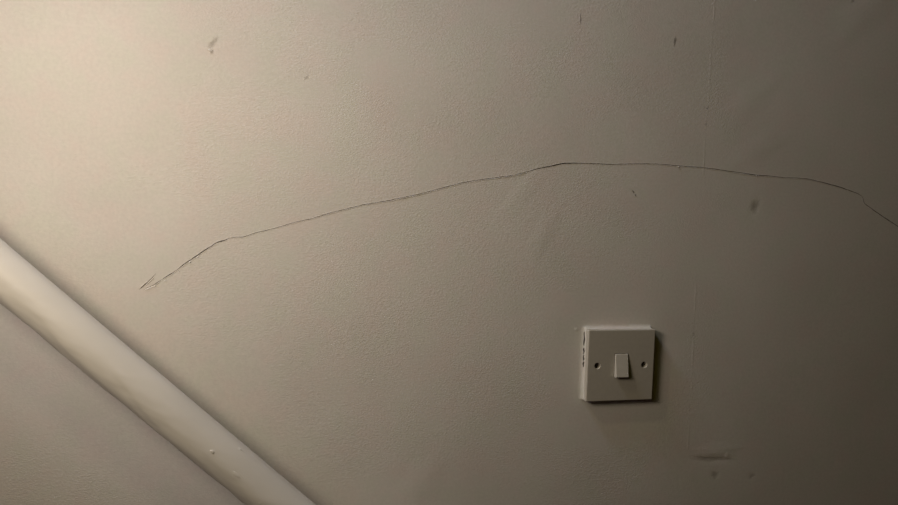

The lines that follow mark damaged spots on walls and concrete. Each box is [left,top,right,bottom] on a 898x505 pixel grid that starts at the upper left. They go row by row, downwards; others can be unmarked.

crack [140,162,898,290]